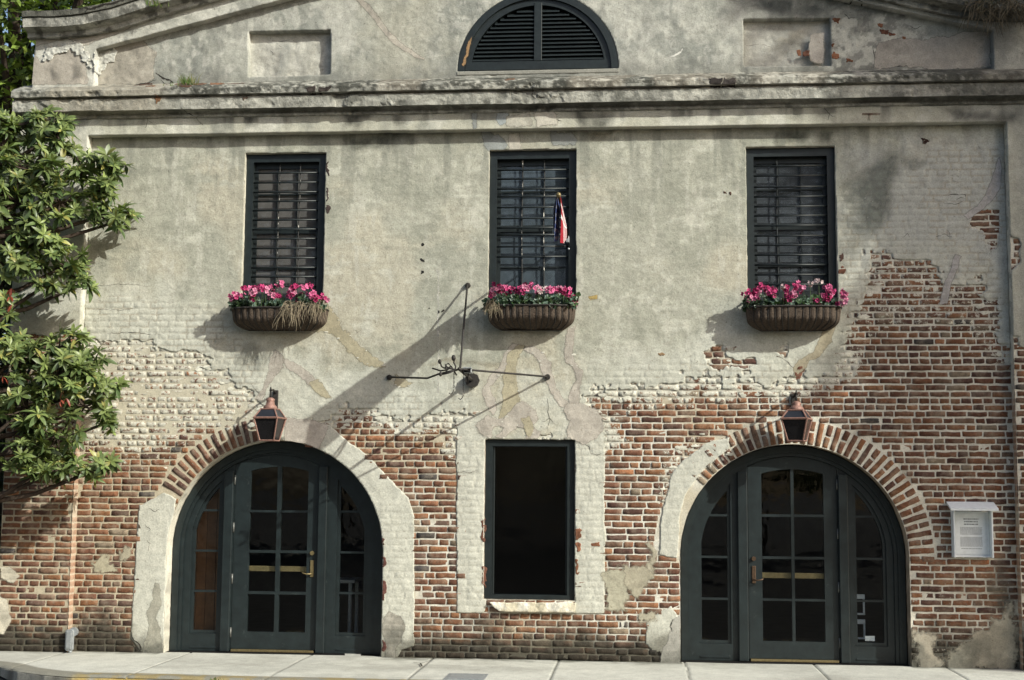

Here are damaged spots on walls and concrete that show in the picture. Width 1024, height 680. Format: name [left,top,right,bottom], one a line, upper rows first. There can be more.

water stain [854,156,895,230]
flaking render [970,209,999,249]
flaking render [843,250,1010,355]
peeling [81,330,264,440]
peeling [598,386,636,403]
flaking render [704,346,756,388]
peeling [739,366,805,398]
peeling [326,408,446,435]
flaking render [574,528,600,575]